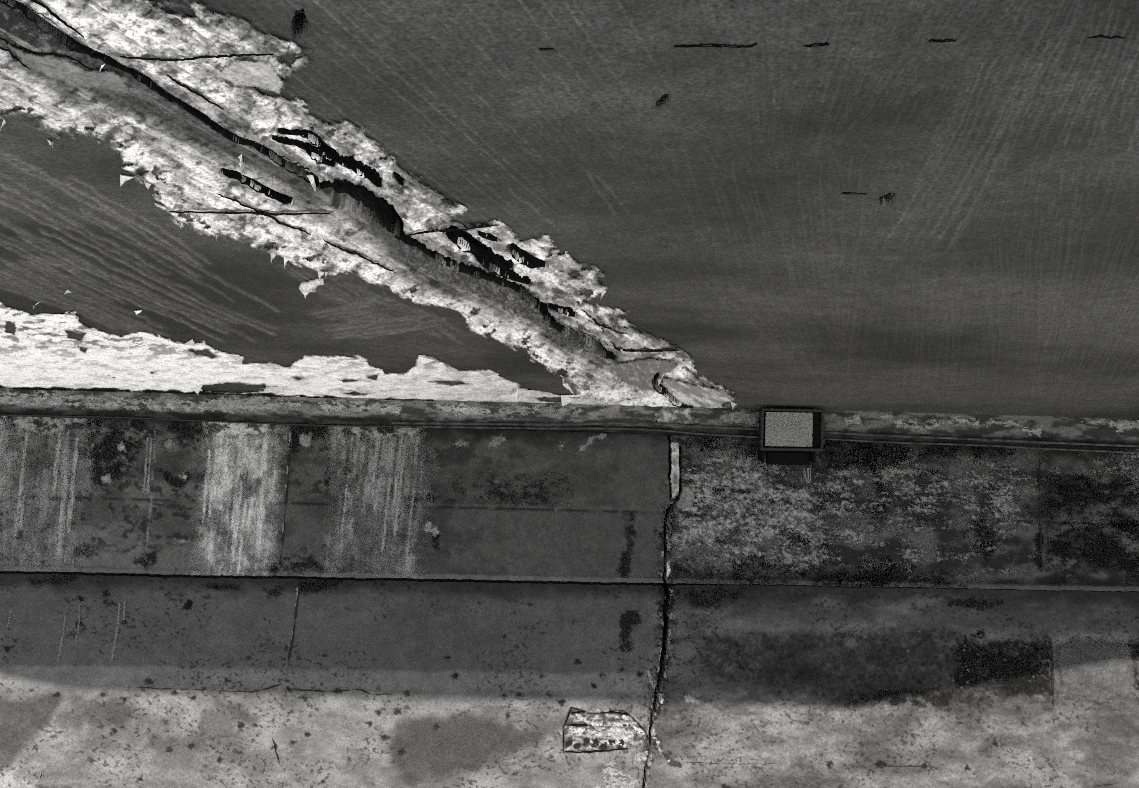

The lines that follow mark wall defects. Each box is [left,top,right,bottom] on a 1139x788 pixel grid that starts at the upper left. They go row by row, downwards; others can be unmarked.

crack [805,41,829,49]
peeling [0,0,738,411]
crack [0,0,774,788]
damp [0,416,87,557]
damp [203,422,276,573]
damp [334,424,423,548]
damp [0,697,128,766]
damp [392,718,539,781]
spalling [558,700,648,764]